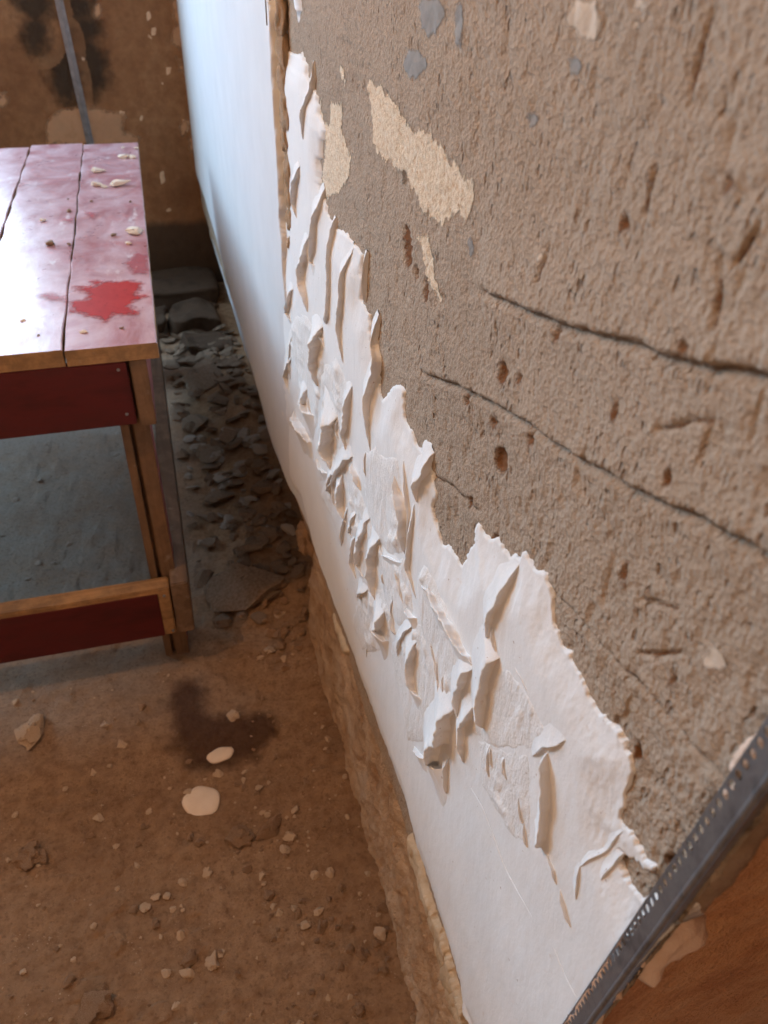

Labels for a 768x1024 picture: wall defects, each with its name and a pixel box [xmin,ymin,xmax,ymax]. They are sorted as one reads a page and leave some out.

spalling [320,98,351,199]
spalling [367,78,474,227]
spalling [402,224,442,302]
hole [496,361,523,385]
crack [485,290,768,377]
hole [494,447,508,472]
crack [427,374,750,542]